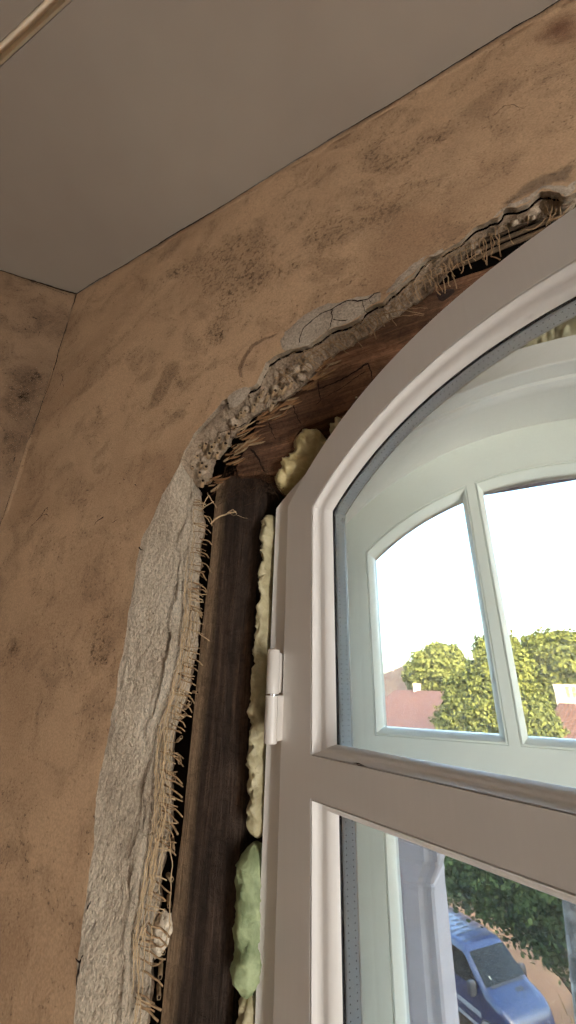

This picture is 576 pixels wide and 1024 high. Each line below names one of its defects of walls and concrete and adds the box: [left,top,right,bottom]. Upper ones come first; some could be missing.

crack [0,0,560,435]
flaking render [74,180,576,1024]